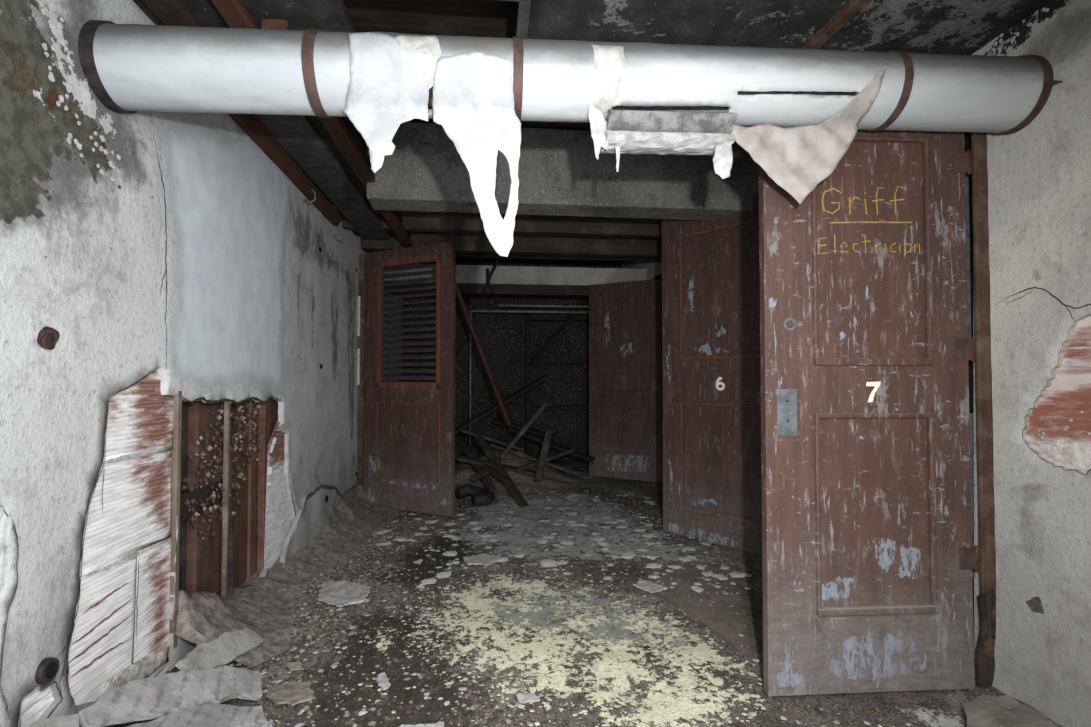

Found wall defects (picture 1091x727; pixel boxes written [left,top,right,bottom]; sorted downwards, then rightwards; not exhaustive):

flaking render [1022,316,1091,475]
flaking render [0,367,296,727]
peeling [333,567,762,727]